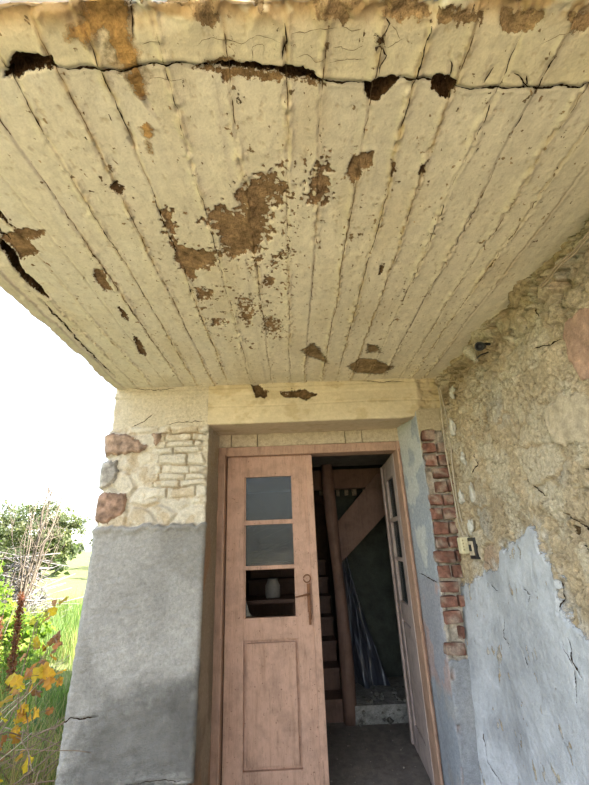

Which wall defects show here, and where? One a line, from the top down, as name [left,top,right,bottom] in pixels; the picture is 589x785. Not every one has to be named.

crack [2,0,589,138]
spalling [499,0,553,40]
spalling [567,10,589,36]
peeling [0,213,66,281]
crack [0,211,113,374]
peeling [74,252,119,305]
crack [32,161,221,370]
peeling [118,296,148,356]
peeling [131,146,374,401]
peeling [301,296,452,377]
crack [323,161,519,382]
peeling [420,430,589,785]